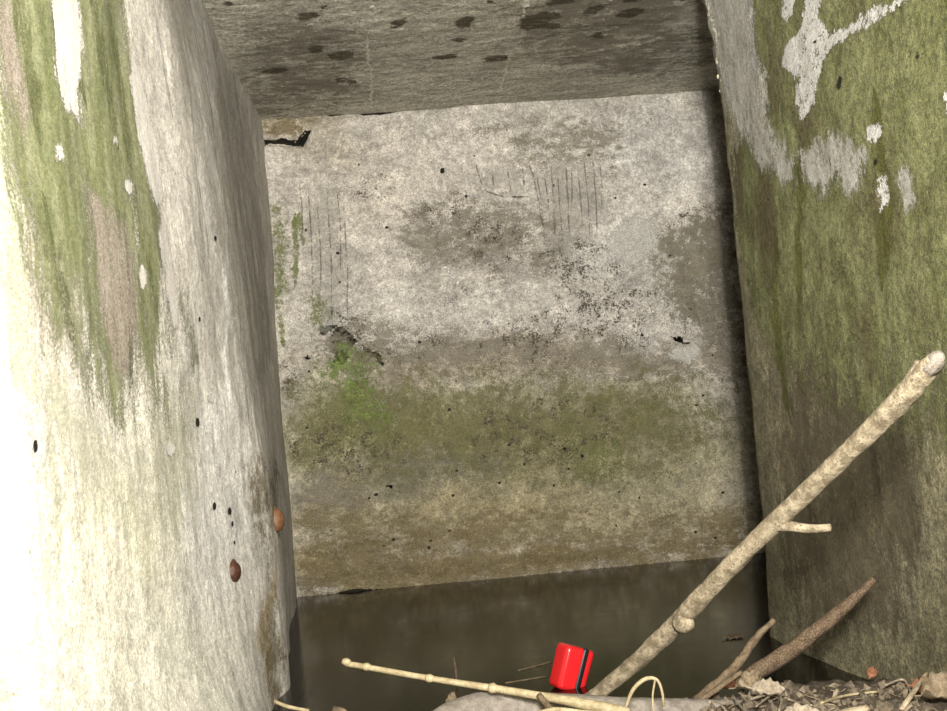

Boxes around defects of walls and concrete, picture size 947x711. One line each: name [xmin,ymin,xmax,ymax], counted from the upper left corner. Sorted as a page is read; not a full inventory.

water stain [0,0,32,146]
crack [327,0,403,117]
crack [521,0,531,17]
water stain [492,0,715,77]
peeling [705,0,882,197]
peeling [780,0,908,120]
peeling [875,166,916,214]
water stain [87,190,140,379]
water stain [301,197,452,366]
water stain [776,354,893,504]
water stain [294,503,753,597]
water stain [780,417,928,641]